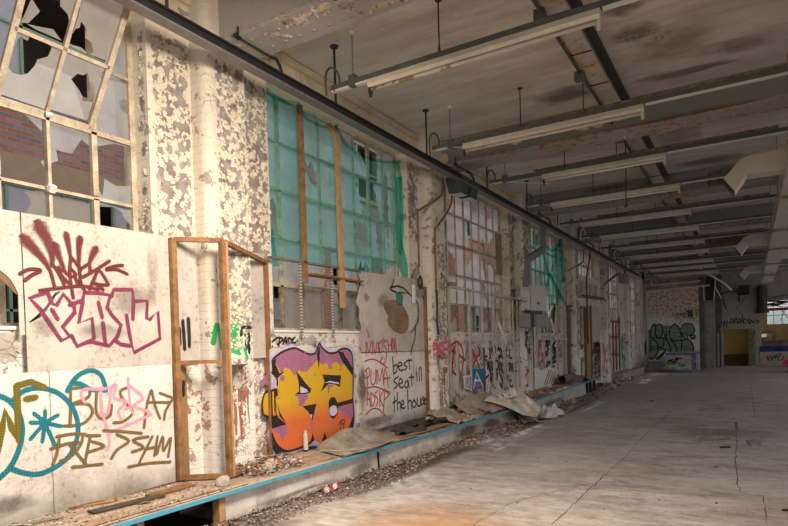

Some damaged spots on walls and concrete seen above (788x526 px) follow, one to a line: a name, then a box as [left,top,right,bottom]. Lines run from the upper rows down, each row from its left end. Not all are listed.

peeling [265,0,352,38]
peeling [136,28,195,243]
peeling [407,161,420,242]
peeling [211,59,272,459]
peeling [431,186,533,407]
peeling [0,333,25,364]
crack [716,433,786,523]